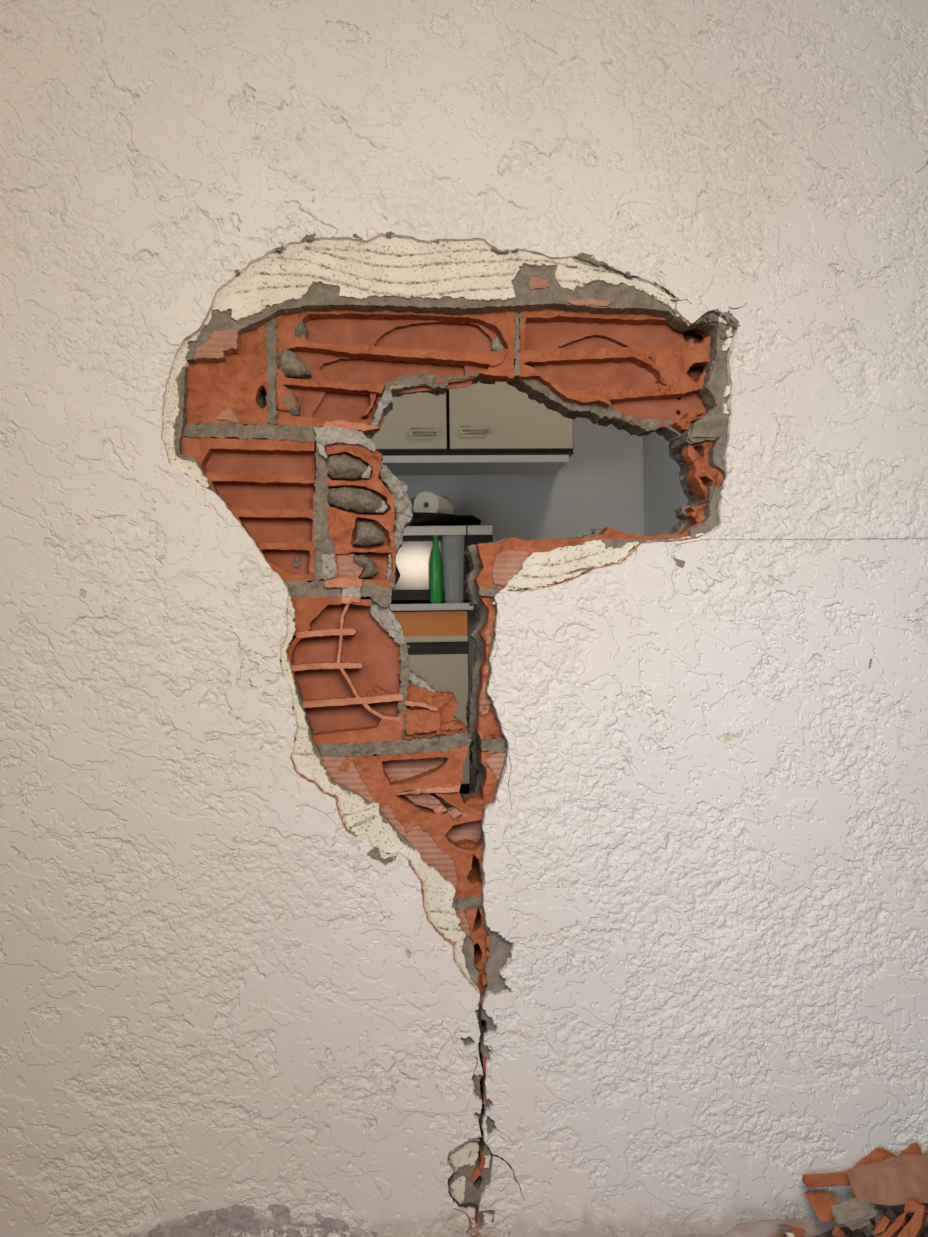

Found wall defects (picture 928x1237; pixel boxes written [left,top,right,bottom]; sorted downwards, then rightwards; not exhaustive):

spalling [162,231,741,1228]